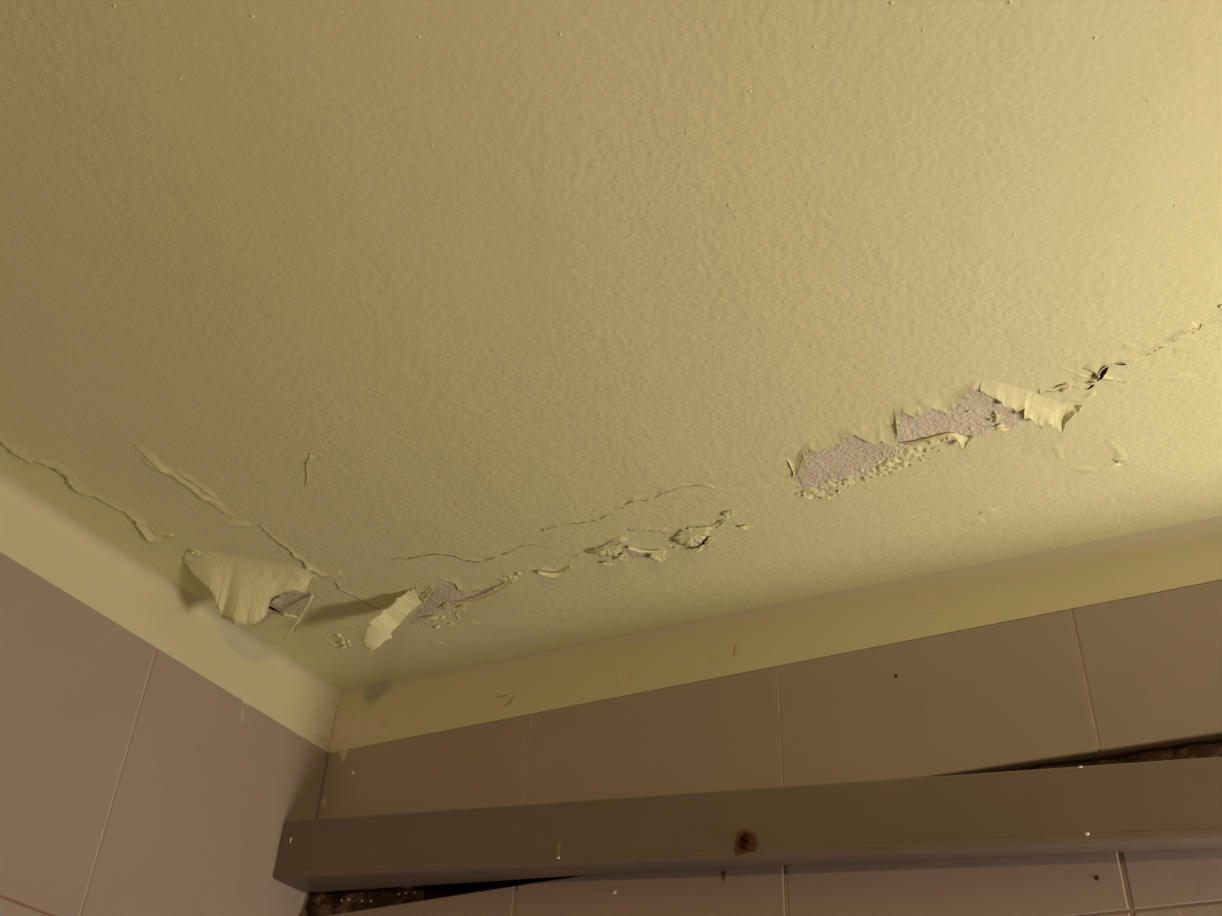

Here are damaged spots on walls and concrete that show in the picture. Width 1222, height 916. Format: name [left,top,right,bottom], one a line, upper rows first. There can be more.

peeling [787,380,1083,500]
crack [0,431,174,543]
peeling [184,549,318,641]
crack [392,543,545,563]
peeling [336,509,753,652]
spalling [1031,742,1222,770]
spalling [306,876,574,916]